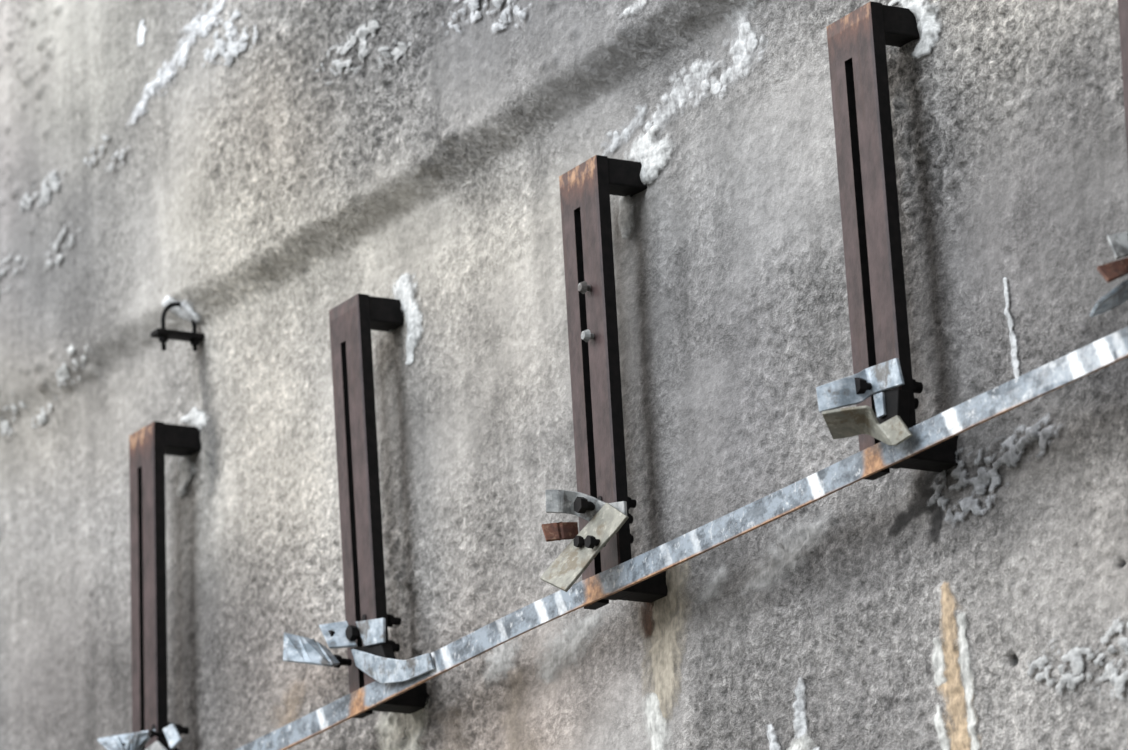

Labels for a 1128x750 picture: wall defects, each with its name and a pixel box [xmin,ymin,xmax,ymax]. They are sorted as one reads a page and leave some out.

water stain [137,19,146,47]
spalling [928,413,1061,523]
corrosion [641,601,655,637]
corrosion [932,582,979,750]
spalling [1012,617,1128,700]
efflorescence [767,677,819,750]